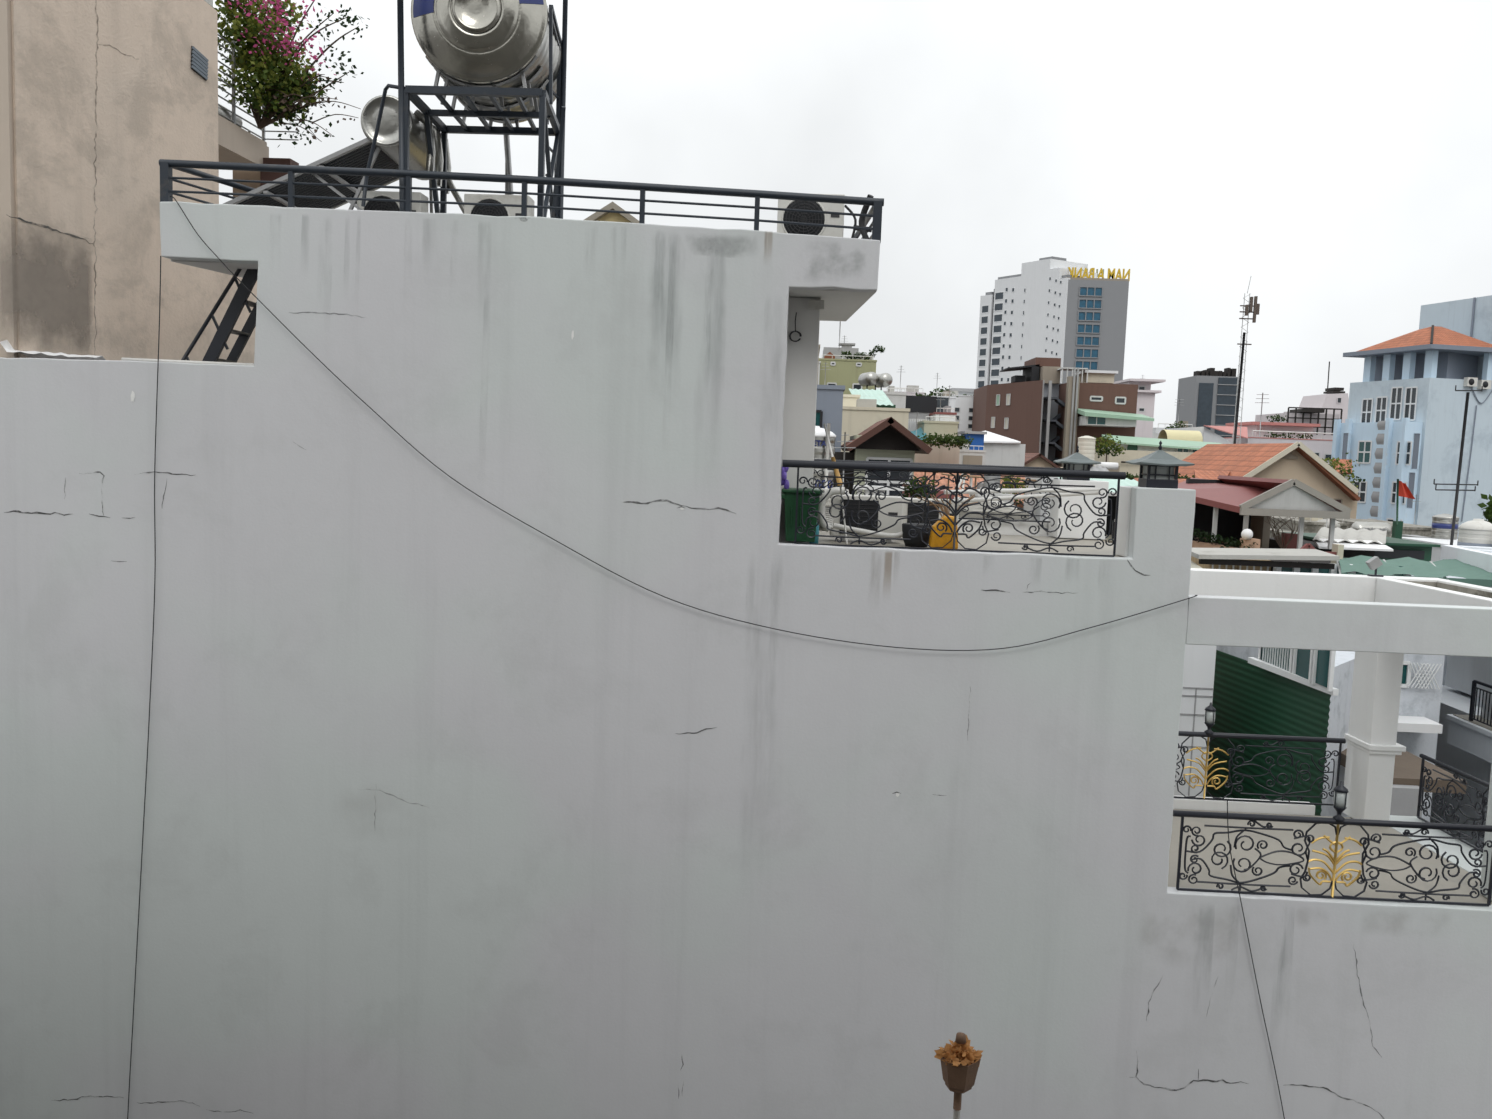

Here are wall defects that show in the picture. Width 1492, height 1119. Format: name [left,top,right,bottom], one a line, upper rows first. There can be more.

crack [4,471,193,519]
crack [625,499,736,514]
crack [1354,950,1381,1056]
crack [1136,1065,1247,1091]
crack [1290,1084,1382,1116]